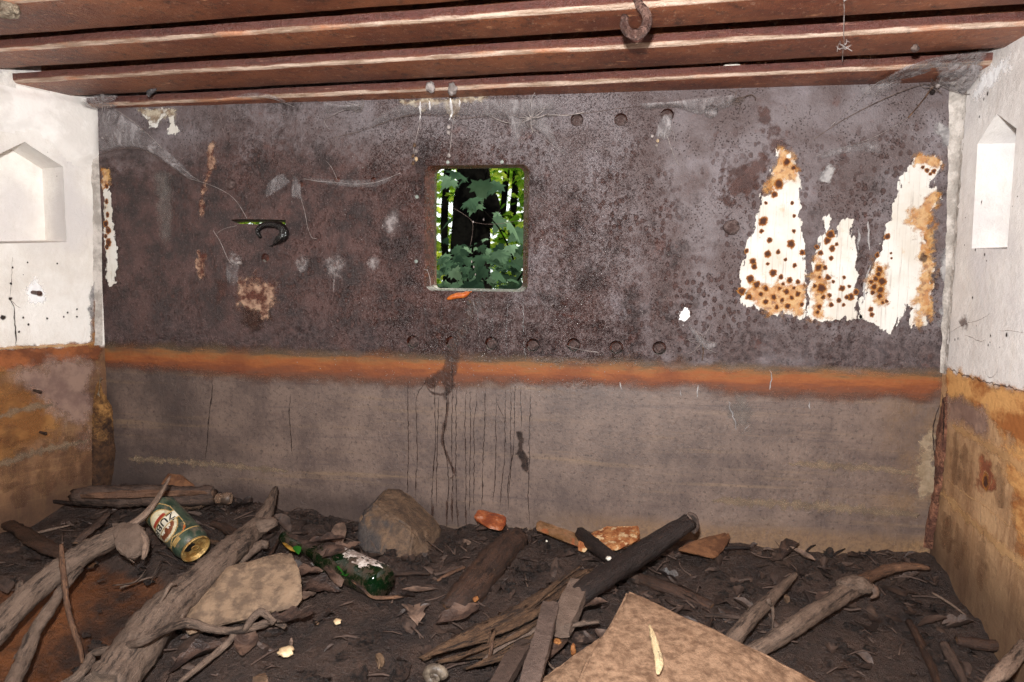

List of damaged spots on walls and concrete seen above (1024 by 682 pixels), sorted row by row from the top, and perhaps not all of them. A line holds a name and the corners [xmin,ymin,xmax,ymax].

crack [9,257,20,341]
peeling [63,168,118,340]
peeling [138,108,180,135]
corrosion [199,142,217,216]
corrosion [195,250,275,331]
peeling [737,147,943,334]
damp [407,295,531,526]
corrosion [0,342,1024,557]